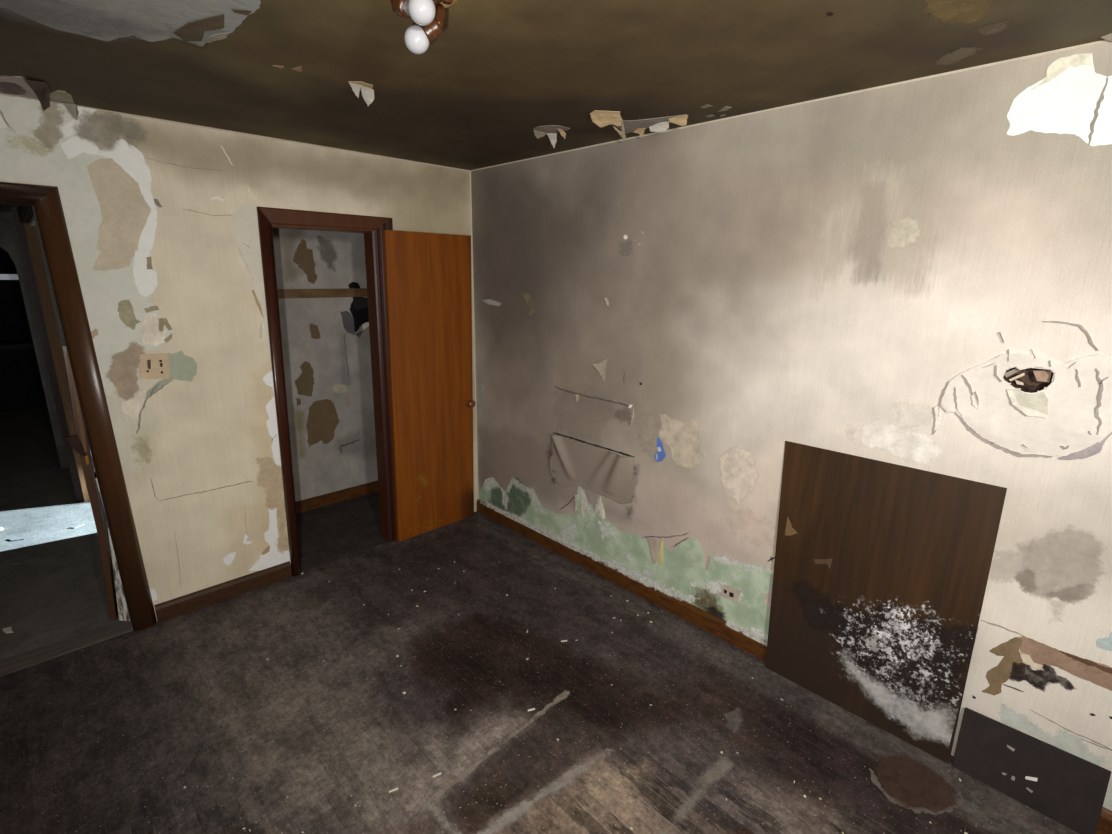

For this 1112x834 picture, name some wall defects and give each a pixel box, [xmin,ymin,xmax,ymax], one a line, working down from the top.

peeling [0,0,261,50]
peeling [533,125,570,148]
peeling [590,110,688,141]
peeling [1007,53,1112,146]
peeling [0,75,197,421]
peeling [210,196,271,356]
spalling [340,282,369,337]
peeling [263,371,281,467]
peeling [295,361,351,447]
peeling [478,477,774,646]
damp [991,532,1099,606]
peeling [972,620,1112,699]